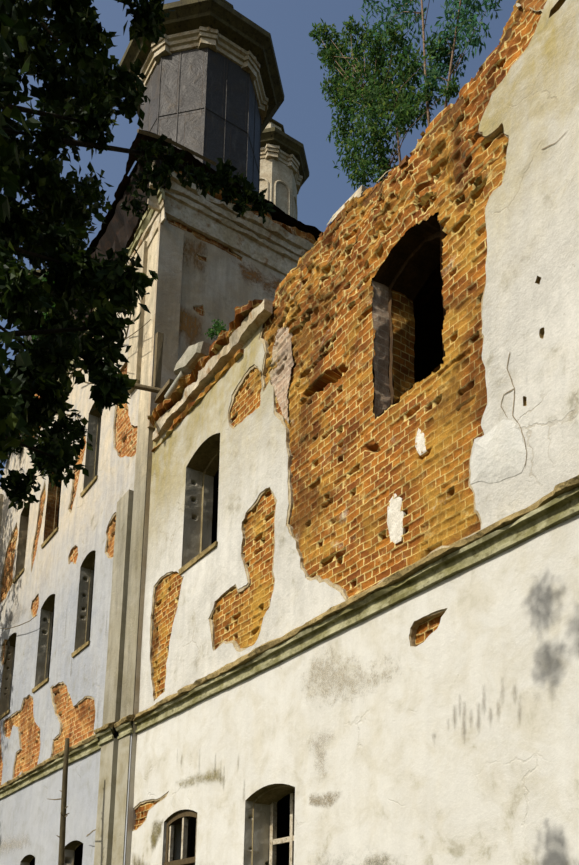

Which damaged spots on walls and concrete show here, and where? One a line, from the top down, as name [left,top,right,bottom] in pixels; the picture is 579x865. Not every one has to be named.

flaking render [228,0,566,601]
flaking render [113,403,138,458]
crack [501,353,527,465]
flaking render [208,487,277,652]
flaking render [150,571,184,701]
flaking render [409,608,447,647]
flaking render [0,694,41,786]
flaking render [50,681,96,758]